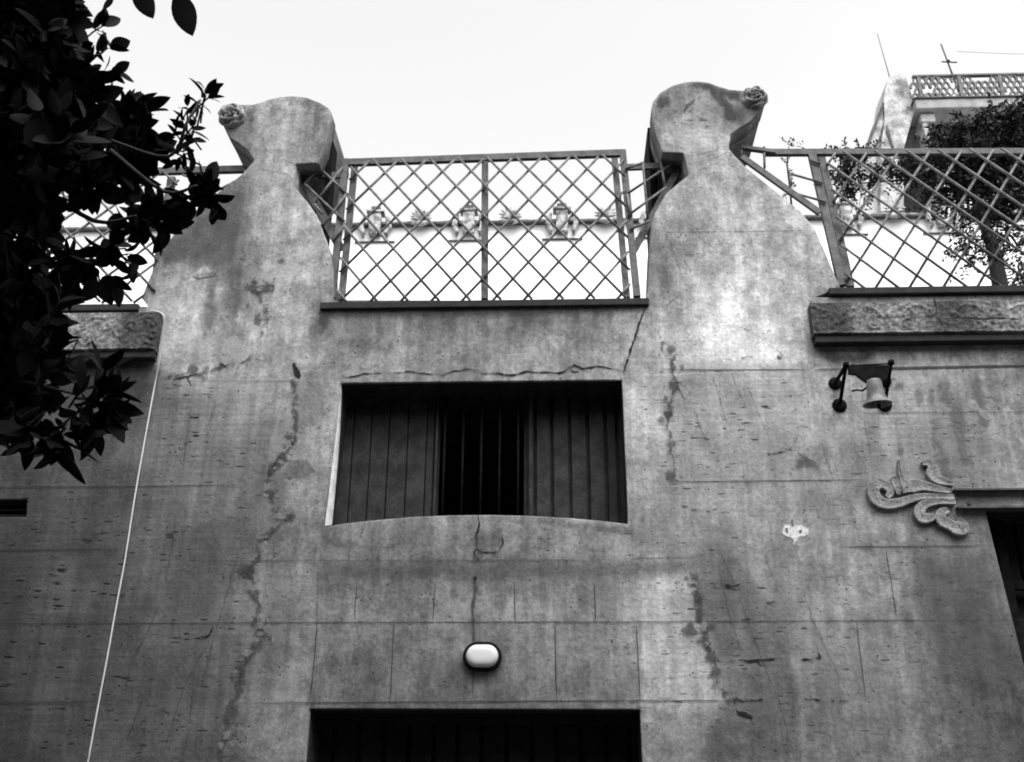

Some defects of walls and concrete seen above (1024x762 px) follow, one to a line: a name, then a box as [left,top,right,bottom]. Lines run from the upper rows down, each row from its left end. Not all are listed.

crack [348,306,646,378]
crack [473,517,504,560]